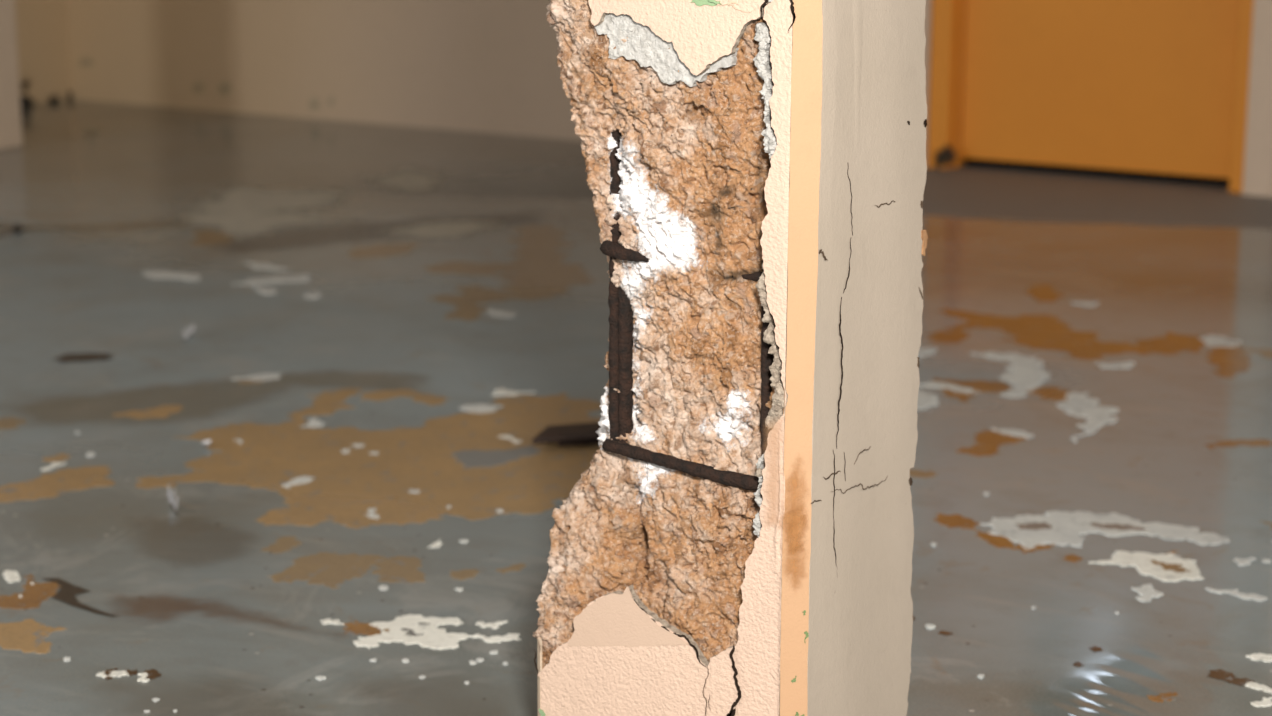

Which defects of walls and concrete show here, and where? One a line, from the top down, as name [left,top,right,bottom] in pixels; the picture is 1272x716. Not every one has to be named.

crack [710,0,796,32]
water stain [607,135,701,345]
spalling [135,0,784,669]
water stain [632,360,655,443]
crack [812,165,896,591]
peeling [925,285,1272,379]
peeling [933,513,1055,554]
crack [633,599,741,716]